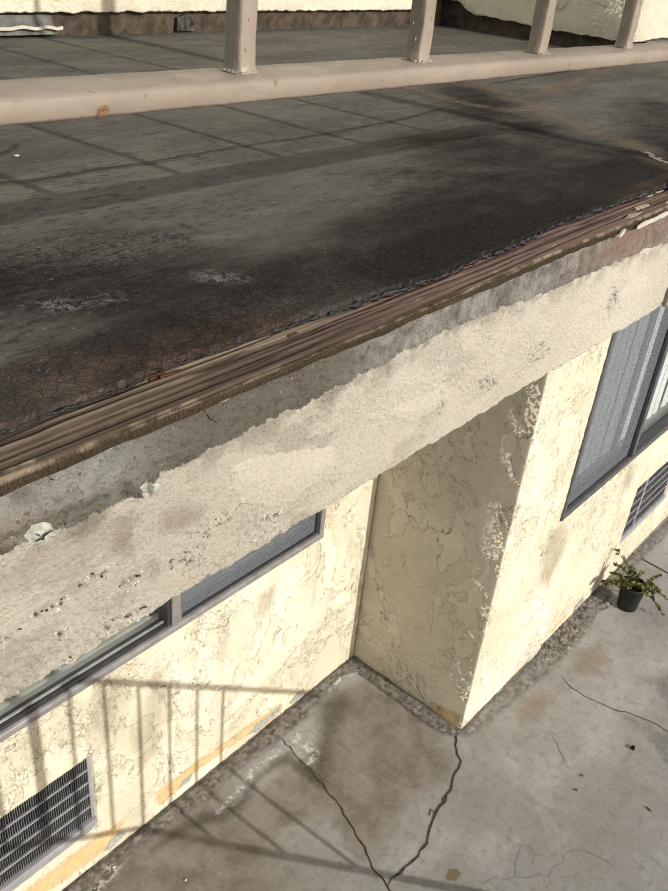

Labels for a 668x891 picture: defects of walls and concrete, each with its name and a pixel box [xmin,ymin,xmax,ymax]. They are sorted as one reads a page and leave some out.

peeling [0,190,668,555]
leakage [199,729,322,822]
crack [281,734,462,891]
crack [560,674,668,732]